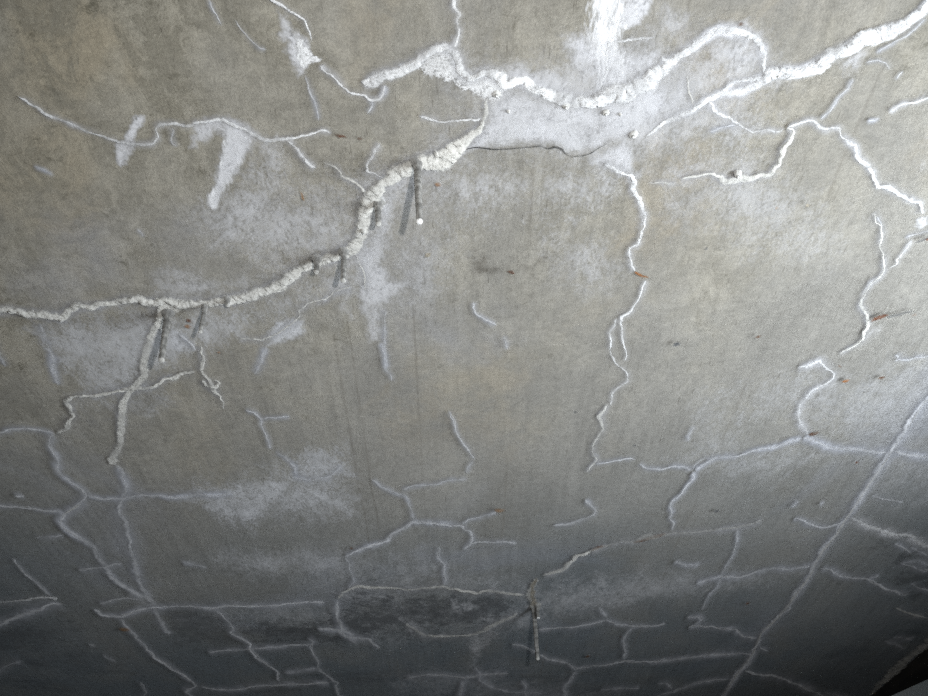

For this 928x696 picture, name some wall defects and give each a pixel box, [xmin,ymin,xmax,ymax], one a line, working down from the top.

crack [271,0,312,39]
crack [452,0,460,48]
crack [19,97,345,168]
crack [321,65,385,113]
crack [683,86,924,213]
water stain [0,0,928,496]
crack [466,145,647,376]
crack [0,427,124,545]
crack [575,218,928,696]
crack [2,571,57,624]
crack [95,566,190,694]
crack [190,483,604,696]